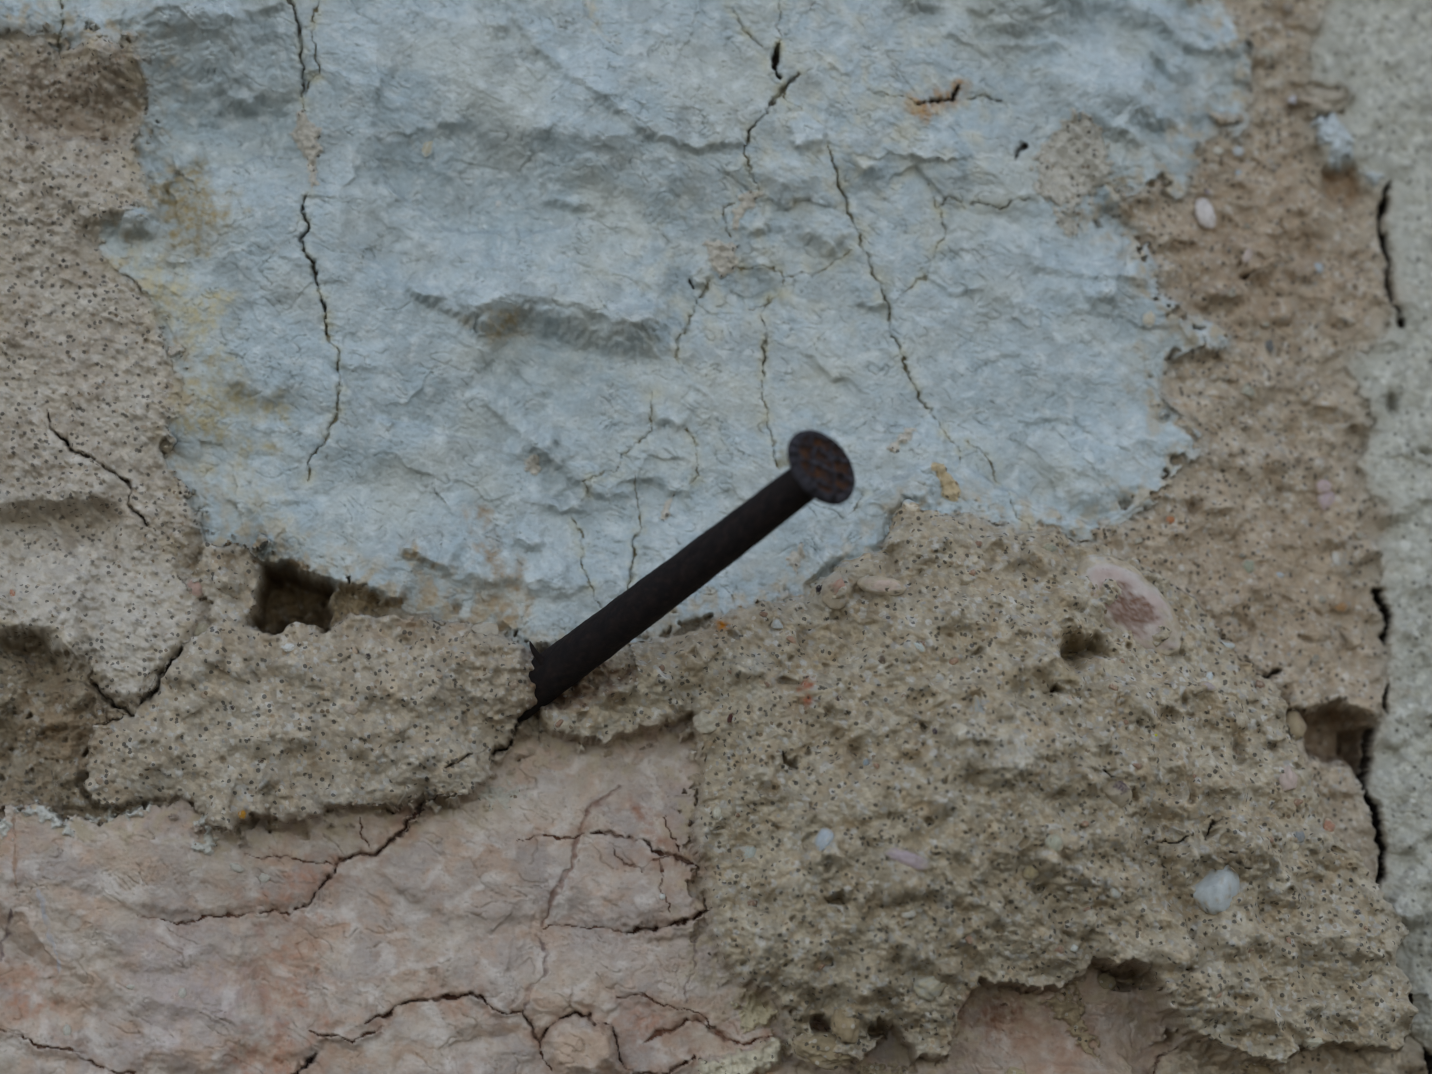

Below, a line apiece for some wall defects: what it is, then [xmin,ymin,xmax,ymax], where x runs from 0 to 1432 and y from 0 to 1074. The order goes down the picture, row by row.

crack [674,0,1033,531]
crack [1377,181,1406,329]
crack [300,192,343,482]
crack [1371,587,1393,646]
rust [516,641,642,719]
peeling [82,802,155,827]
crack [138,706,533,926]
crack [517,816,713,936]
crack [1356,681,1391,885]
crack [298,992,774,1074]
peeling [731,991,780,1035]
peeling [1046,981,1103,1064]